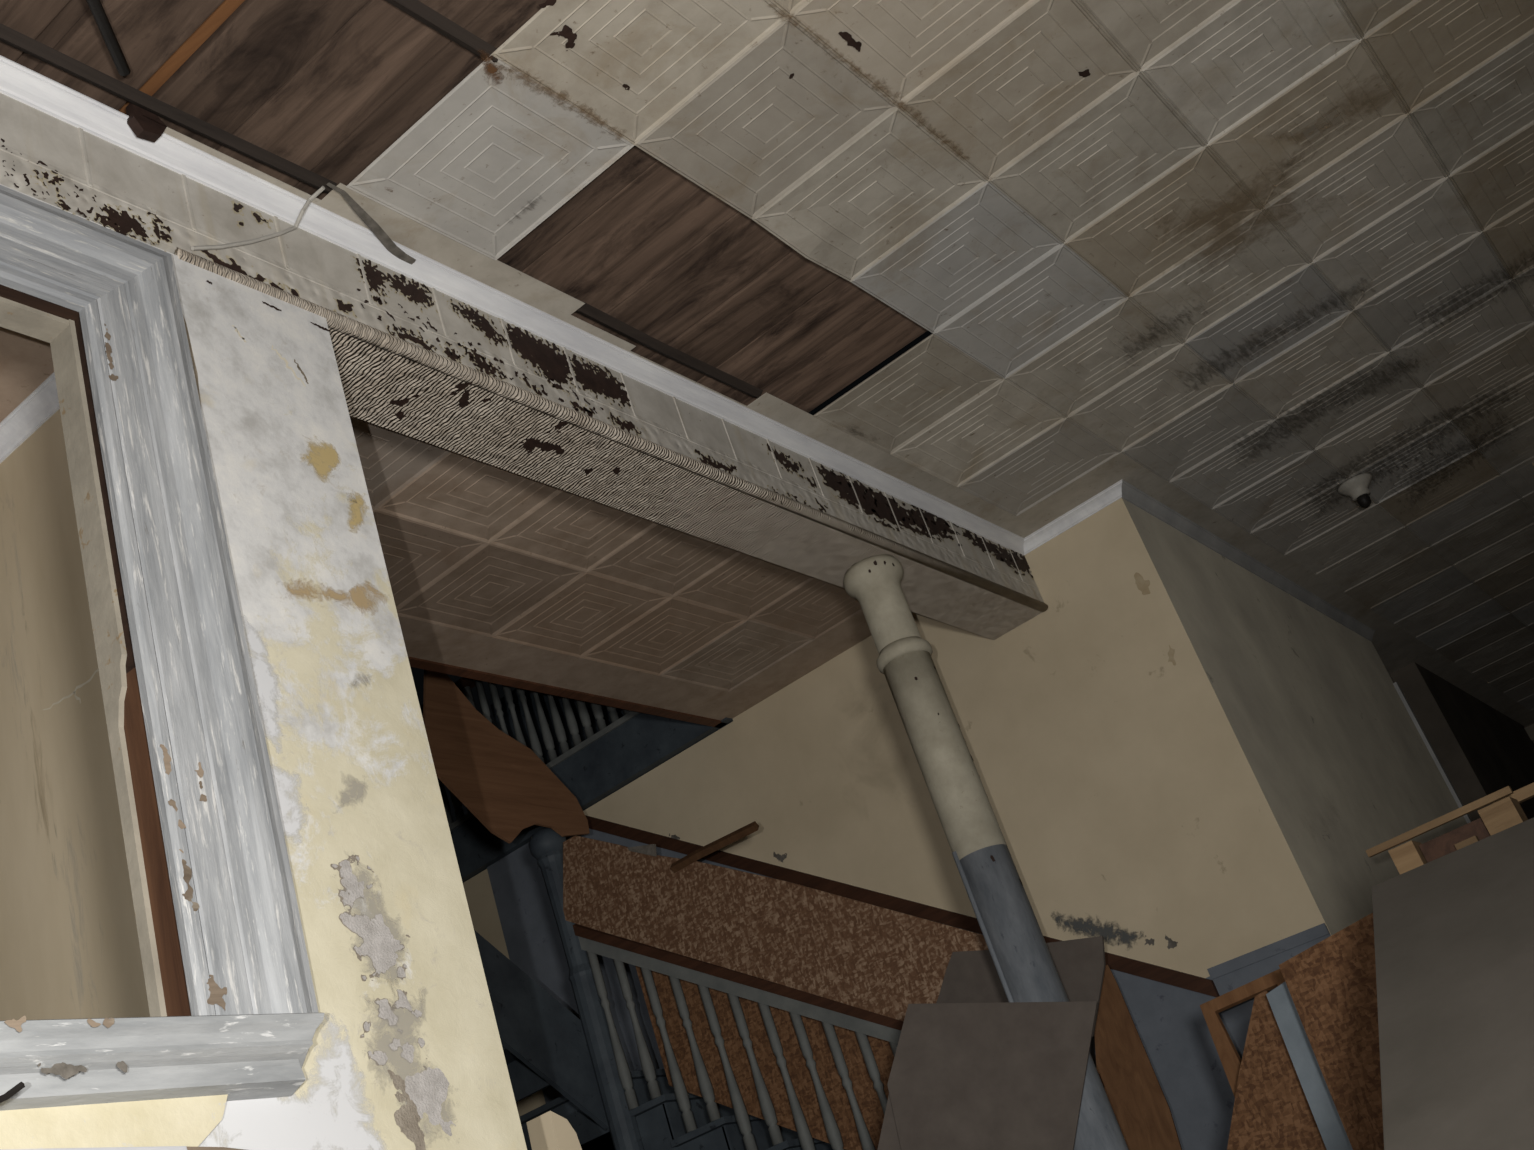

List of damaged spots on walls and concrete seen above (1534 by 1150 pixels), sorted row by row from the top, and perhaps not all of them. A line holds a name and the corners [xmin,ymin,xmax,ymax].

peeling [1,138,174,252]
peeling [231,200,273,229]
peeling [199,250,300,297]
peeling [105,324,118,381]
peeling [333,255,645,454]
peeling [694,449,737,476]
peeling [350,495,364,529]
peeling [761,443,1034,580]
peeling [160,744,172,775]
peeling [194,762,207,802]
peeling [179,849,199,911]
peeling [198,854,456,1150]